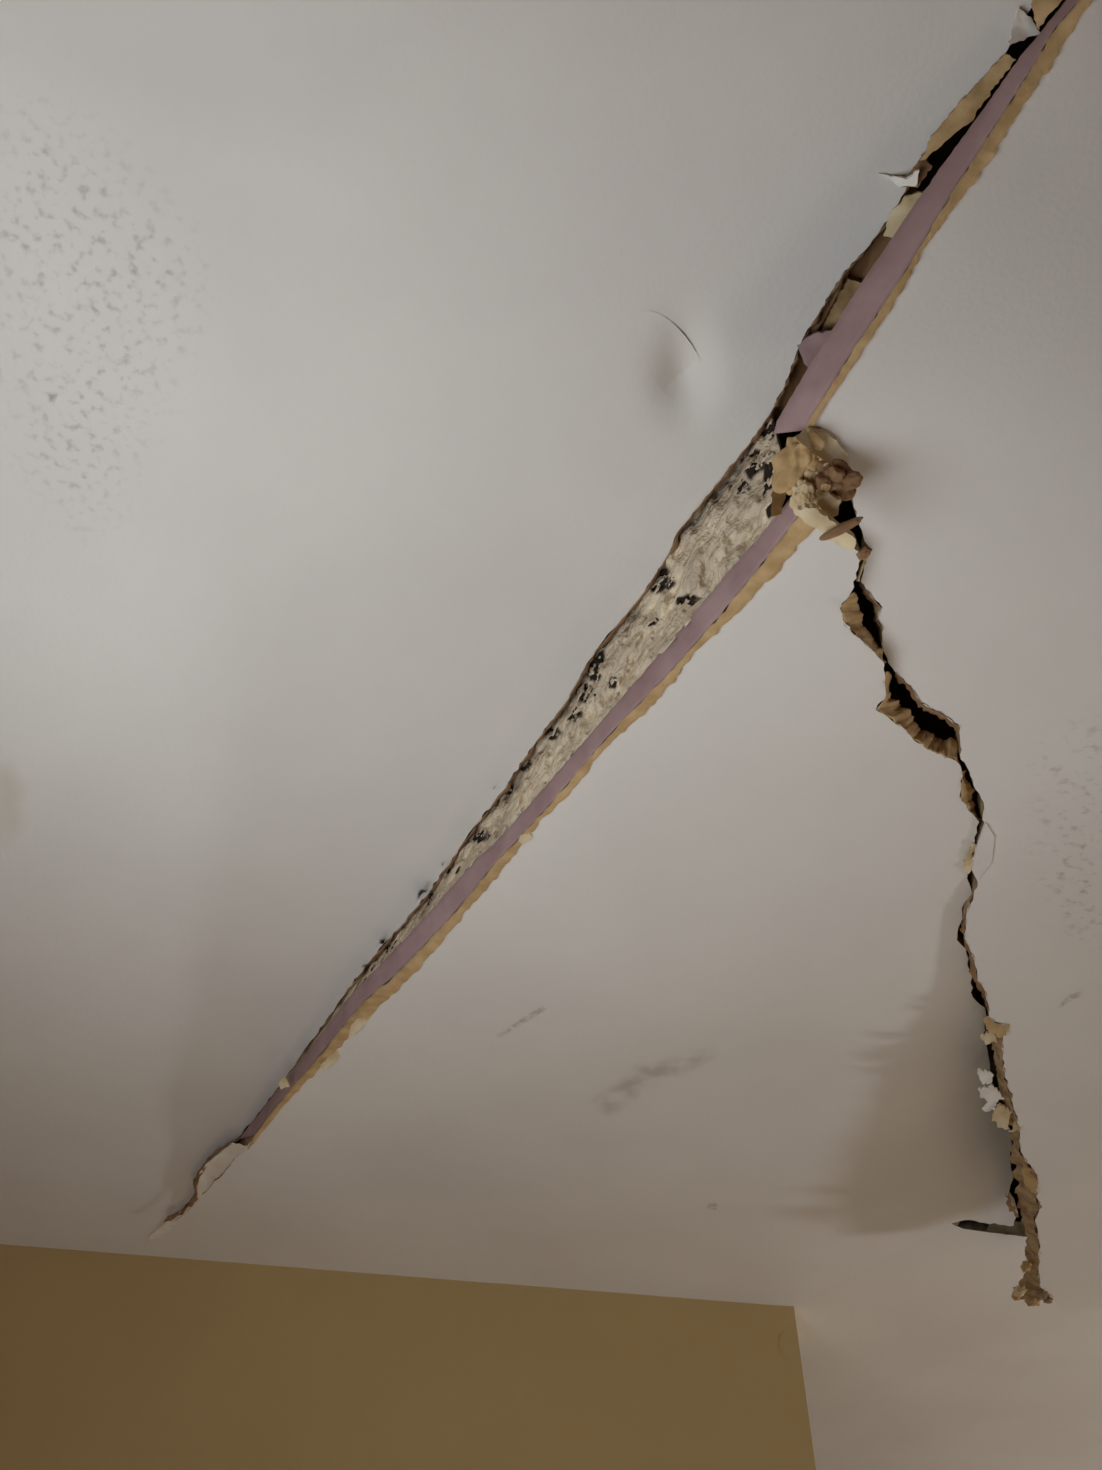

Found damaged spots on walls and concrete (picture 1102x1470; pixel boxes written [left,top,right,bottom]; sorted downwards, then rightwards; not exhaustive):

crack [840,558,1053,1306]